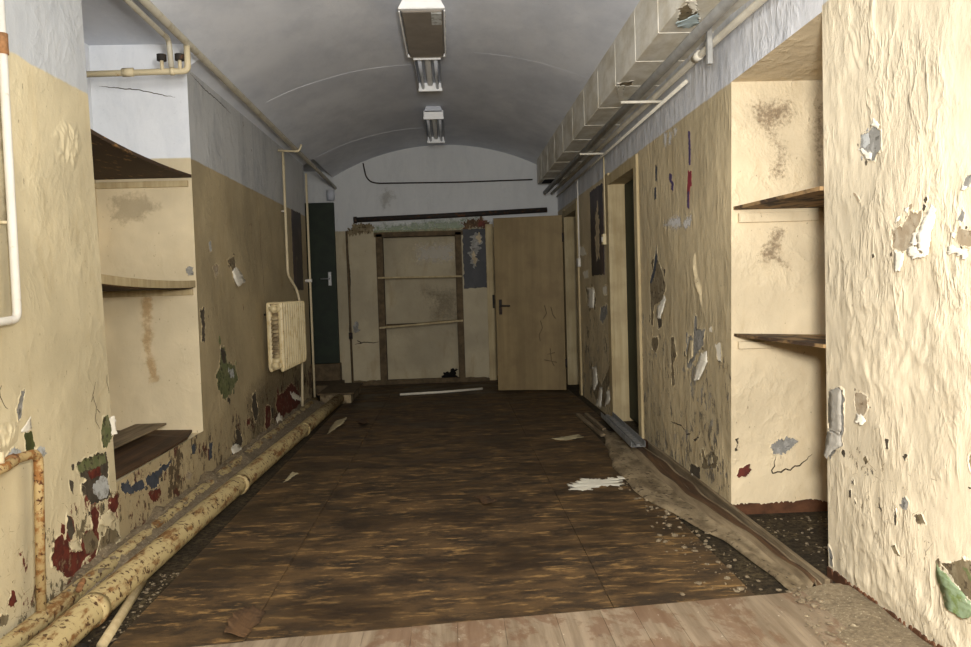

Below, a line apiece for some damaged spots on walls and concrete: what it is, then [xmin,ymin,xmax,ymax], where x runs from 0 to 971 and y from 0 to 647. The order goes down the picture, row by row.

peeling [675,0,701,29]
peeling [857,118,883,165]
peeling [890,195,936,272]
peeling [946,207,971,259]
peeling [649,244,722,387]
peeling [215,336,239,404]
peeling [5,387,48,458]
peeling [824,385,871,461]
peeling [49,413,172,580]
peeling [0,589,18,628]
peeling [935,555,971,619]